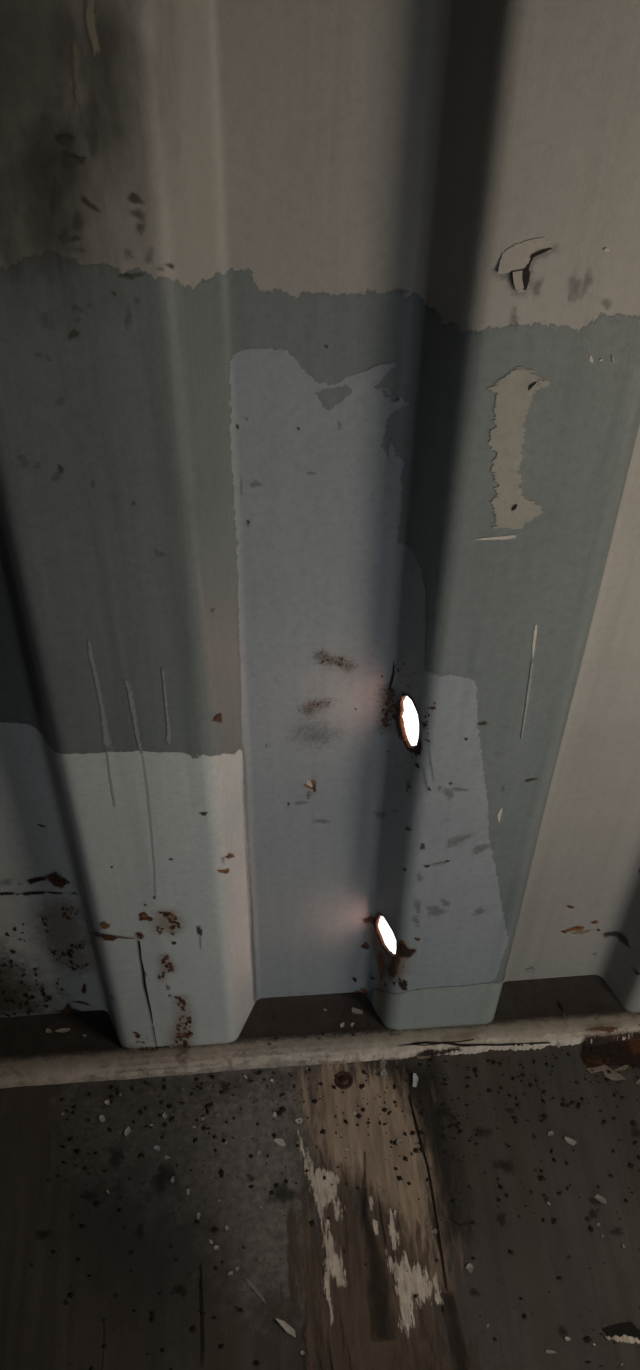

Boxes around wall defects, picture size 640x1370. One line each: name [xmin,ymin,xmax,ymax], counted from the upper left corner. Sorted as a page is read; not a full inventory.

peeling [498,237,553,293]
peeling [487,367,550,530]
corrosion [381,663,436,789]
corrosion [0,872,90,1018]
crack [91,922,158,1050]
corrosion [122,904,193,1050]
corrosion [352,916,417,995]
corrosion [562,921,599,934]